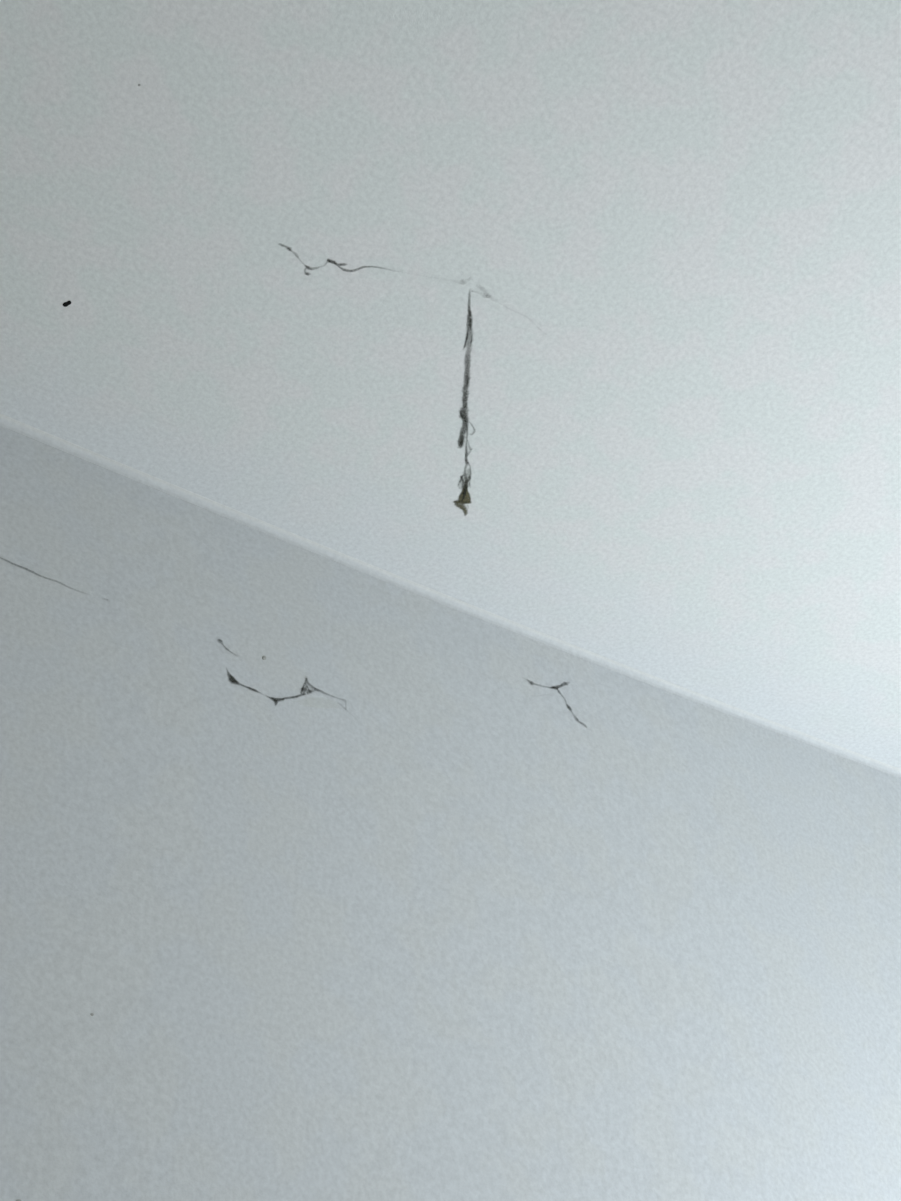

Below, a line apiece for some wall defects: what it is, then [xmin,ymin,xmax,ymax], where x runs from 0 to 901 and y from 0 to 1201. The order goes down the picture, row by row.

crack [282,245,361,275]
crack [454,306,472,515]
crack [228,672,318,705]